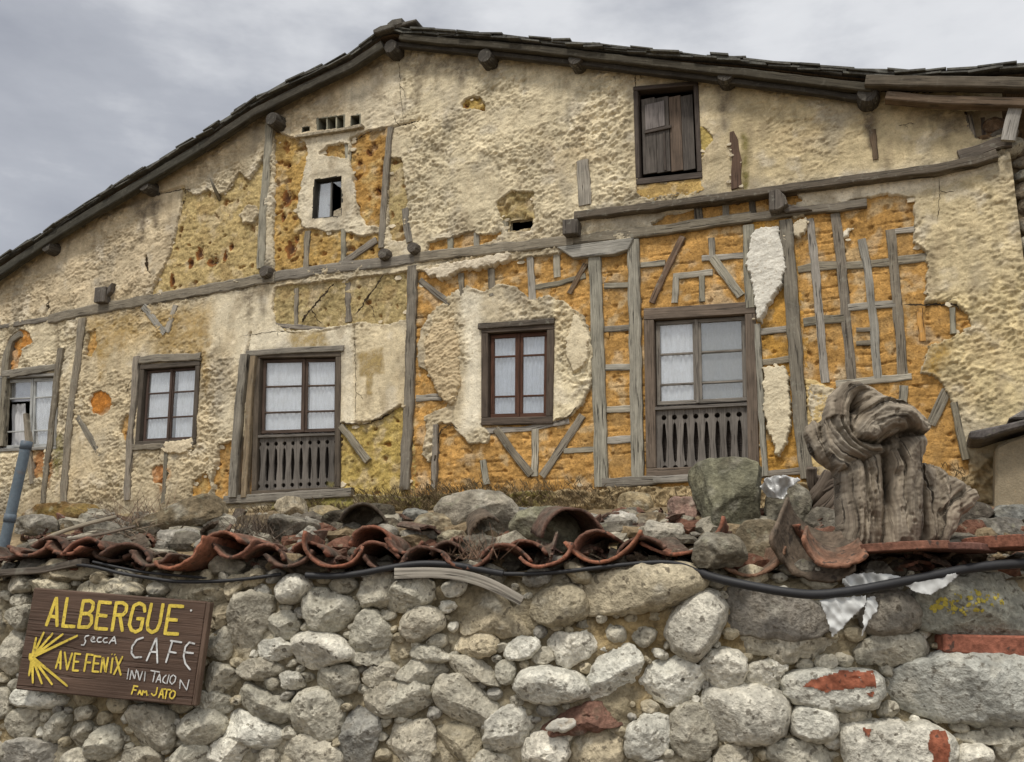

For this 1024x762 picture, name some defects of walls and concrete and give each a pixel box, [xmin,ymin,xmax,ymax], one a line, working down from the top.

spalling [463,98,486,111]
peeling [153,127,408,294]
peeling [10,329,33,370]
peeling [273,191,971,497]
peeling [193,441,243,499]